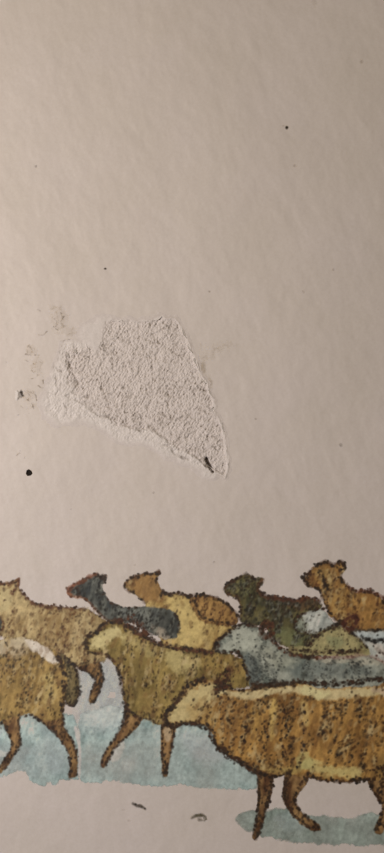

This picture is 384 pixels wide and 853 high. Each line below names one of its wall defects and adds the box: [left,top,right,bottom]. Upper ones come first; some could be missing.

peeling [37,312,232,481]